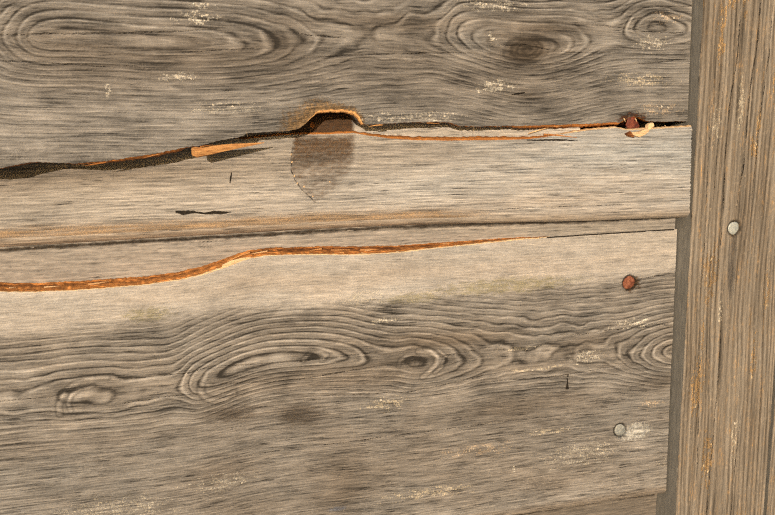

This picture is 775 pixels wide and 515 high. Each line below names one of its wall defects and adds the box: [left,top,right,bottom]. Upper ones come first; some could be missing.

damp [291,136,352,188]
crack [0,0,772,251]
crack [0,203,675,293]